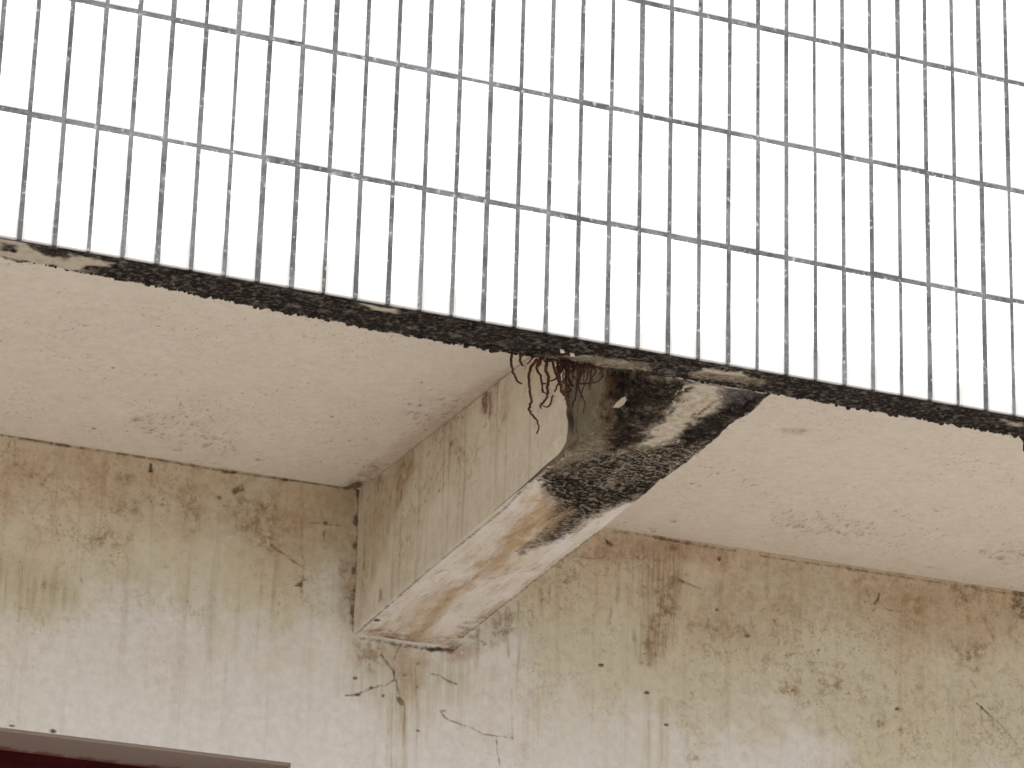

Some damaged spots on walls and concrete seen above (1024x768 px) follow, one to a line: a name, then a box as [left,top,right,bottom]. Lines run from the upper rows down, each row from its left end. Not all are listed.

leakage [1,243,1024,555]